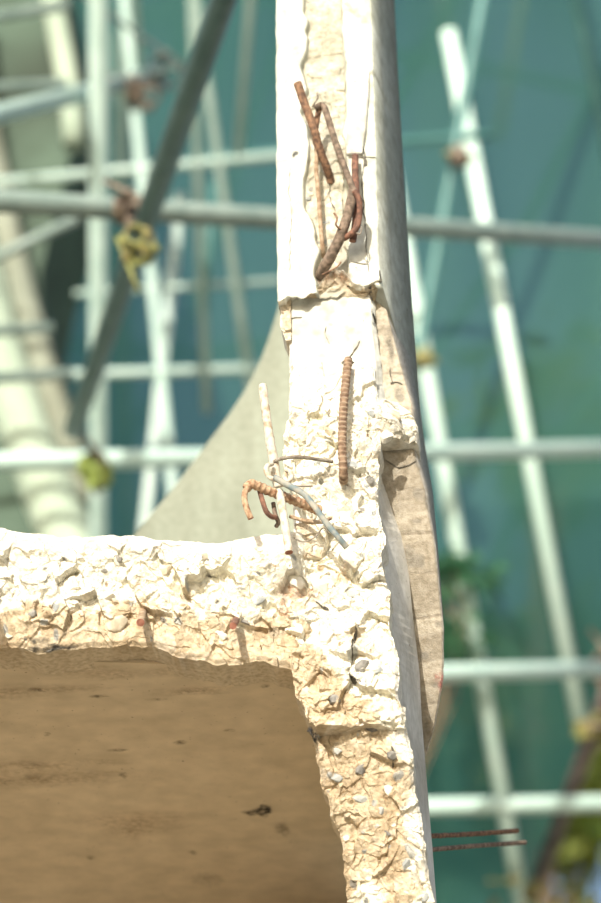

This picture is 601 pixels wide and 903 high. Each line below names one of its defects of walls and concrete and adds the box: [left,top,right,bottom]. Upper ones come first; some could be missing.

spalling [0,0,435,903]
crack [349,622,361,685]